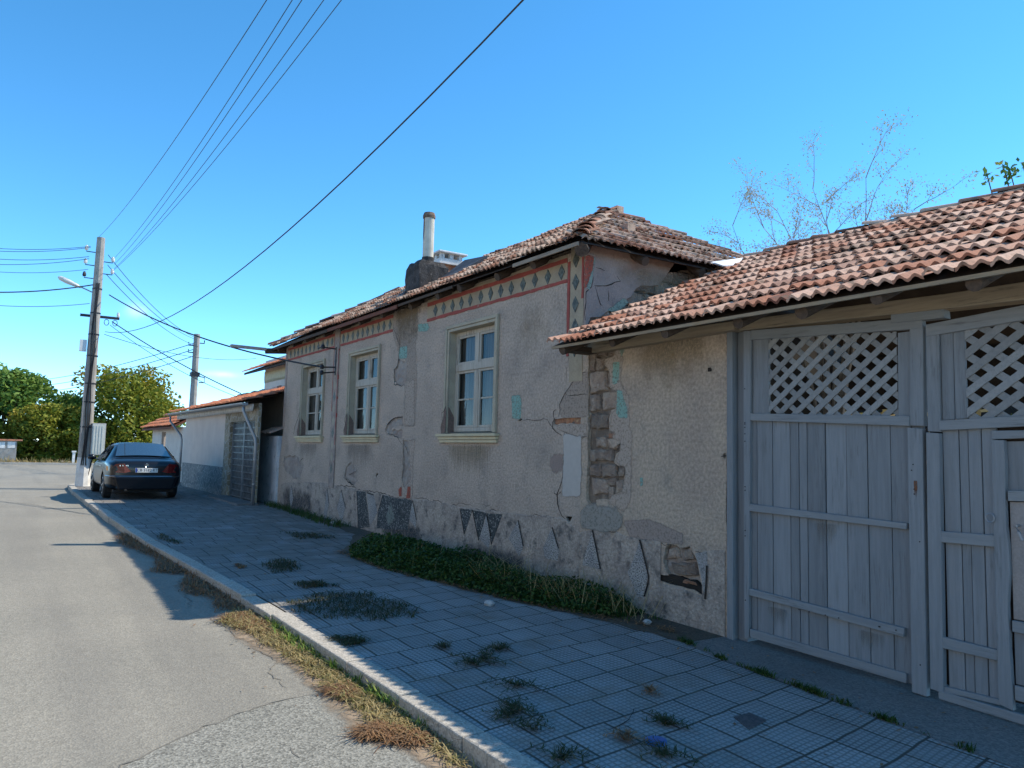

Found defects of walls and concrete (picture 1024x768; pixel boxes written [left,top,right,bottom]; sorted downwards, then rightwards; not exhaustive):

crack [584,267,620,315]
peeling [386,307,429,498]
peeling [555,372,588,439]
peeling [606,349,643,511]
flaking render [660,545,702,594]